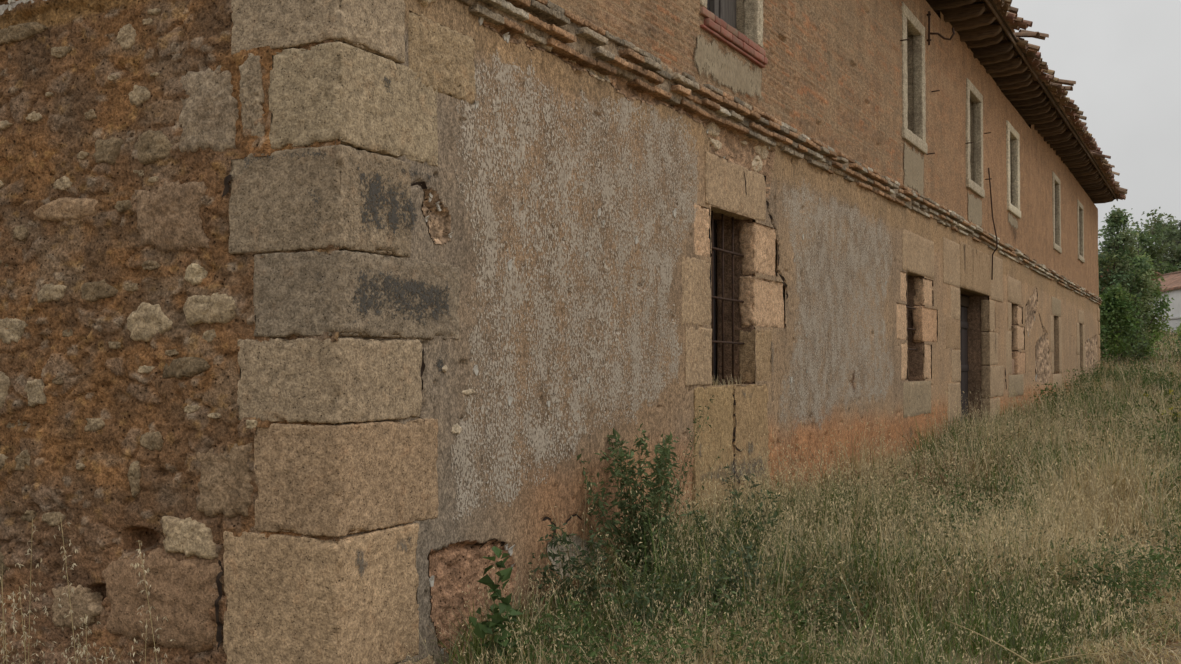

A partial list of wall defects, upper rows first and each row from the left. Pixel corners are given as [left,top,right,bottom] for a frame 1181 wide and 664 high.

spalling [421,187,453,245]
peeling [450,17,894,525]
spalling [427,540,517,660]